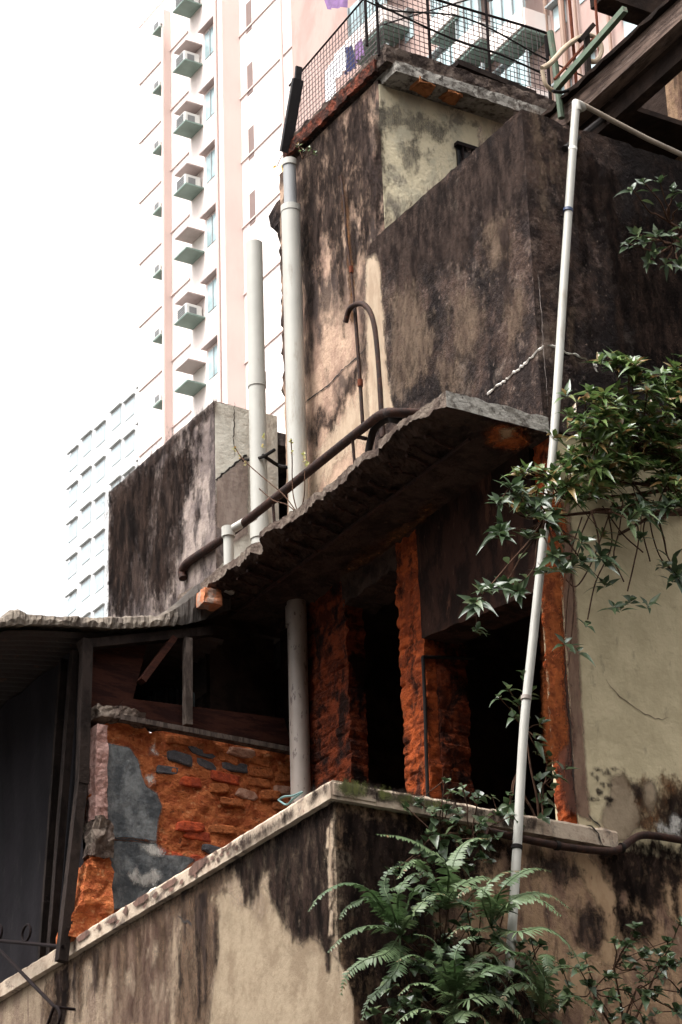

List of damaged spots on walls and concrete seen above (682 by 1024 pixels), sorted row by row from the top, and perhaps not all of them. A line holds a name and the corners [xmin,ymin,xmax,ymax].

leakage [297,97,553,317]
leakage [567,151,682,377]
leakage [107,399,217,617]
crack [215,402,249,542]
peeling [542,500,682,841]
crack [608,683,668,720]
spalling [56,842,240,944]
leakage [42,783,552,1024]
leakage [536,852,579,886]
leakage [570,840,682,953]